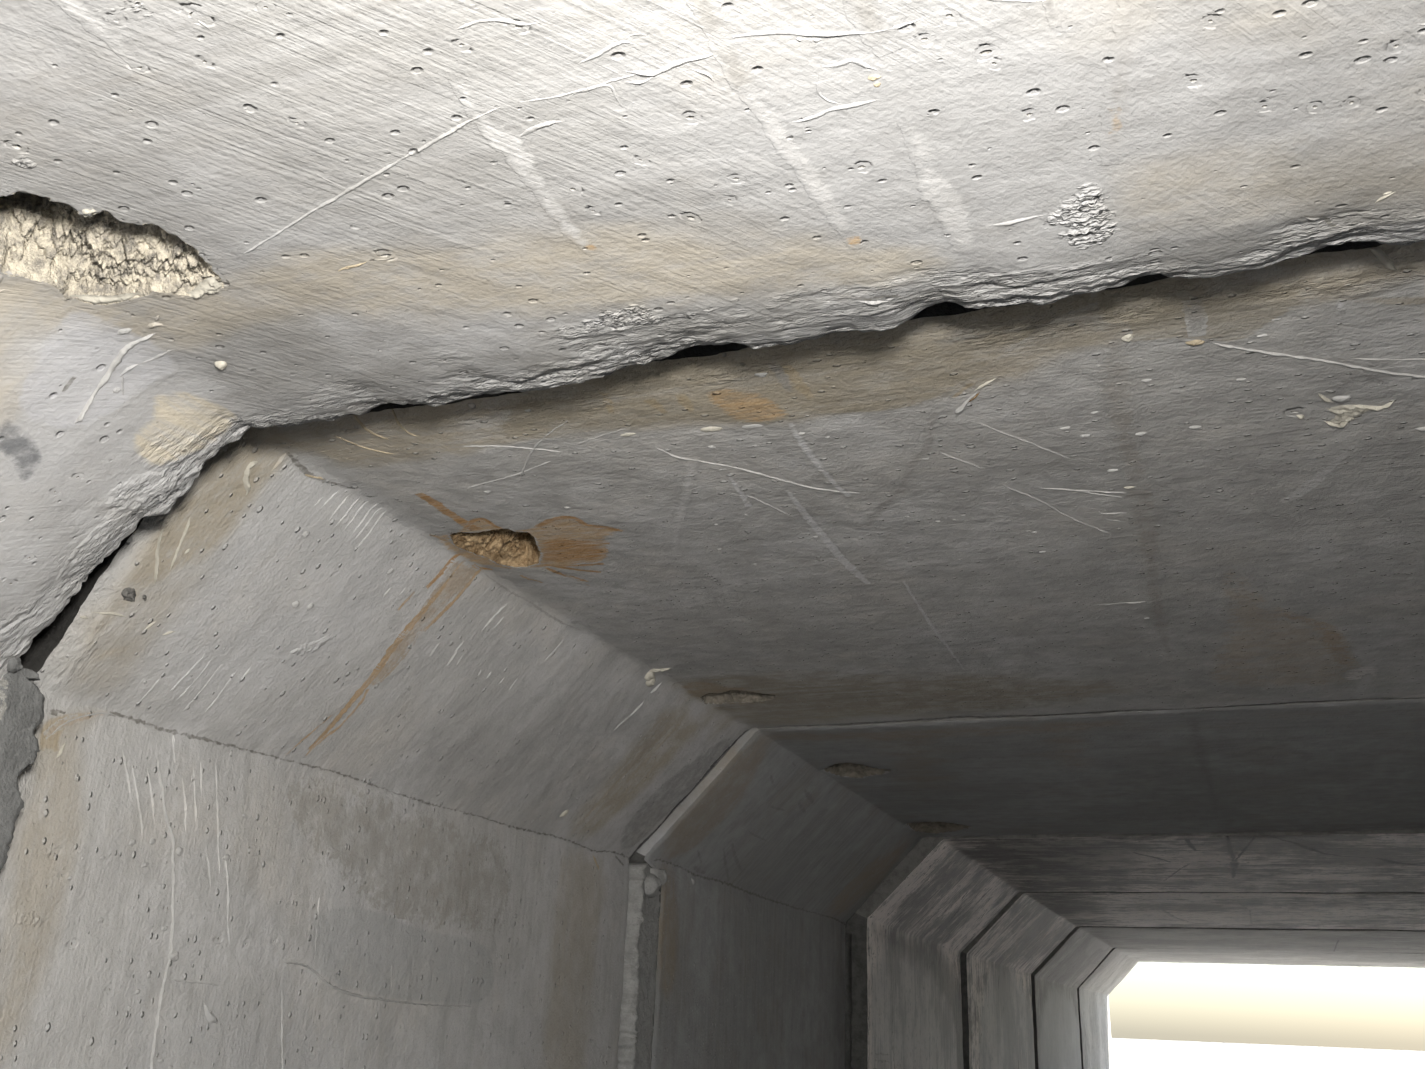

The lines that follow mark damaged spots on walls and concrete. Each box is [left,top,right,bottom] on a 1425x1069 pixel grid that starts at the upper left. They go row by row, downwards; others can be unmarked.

spalling [0,188,229,308]
crack [846,295,909,305]
peeling [75,315,174,423]
crack [1214,343,1425,378]
spalling [56,471,179,579]
peeling [80,516,191,619]
spalling [415,493,623,589]
crack [465,421,624,488]
crack [654,446,856,514]
crack [940,423,1135,533]
rust [283,558,483,758]
crack [105,711,750,1069]